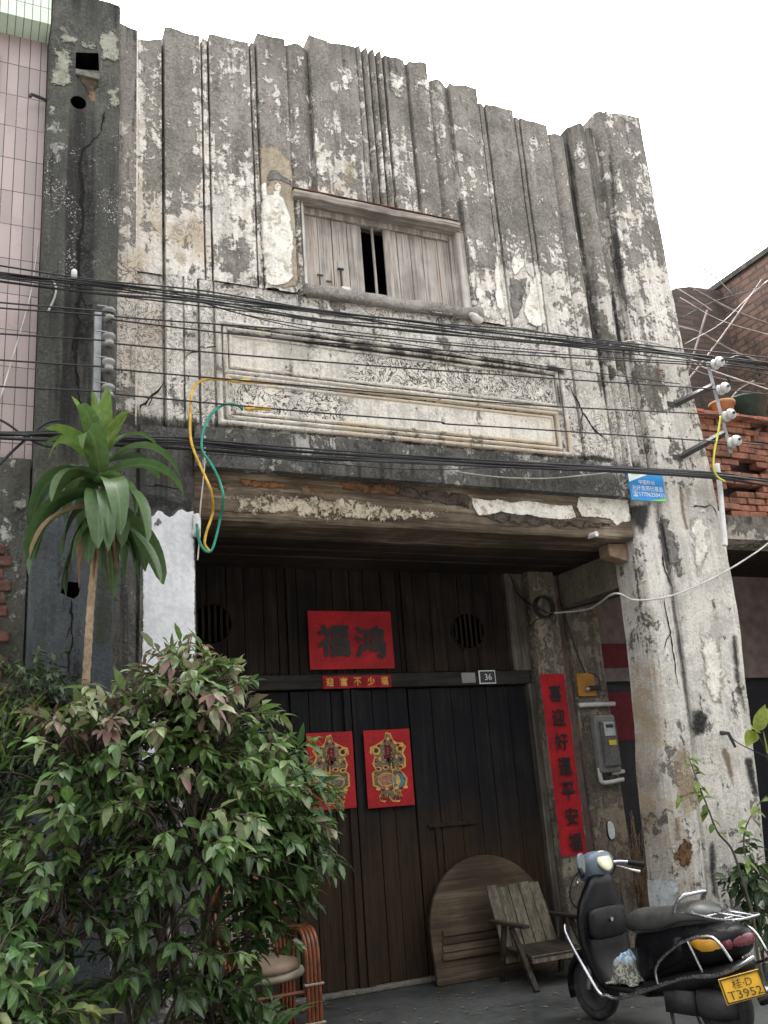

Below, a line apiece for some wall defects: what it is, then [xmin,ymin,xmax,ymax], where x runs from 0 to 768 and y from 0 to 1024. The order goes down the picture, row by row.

spalling [51,26,121,108]
crack [71,112,105,404]
flaking render [212,145,302,288]
peeling [475,256,546,327]
water stain [585,283,606,404]
water stain [609,155,637,435]
crack [569,386,608,441]
spalling [212,478,631,529]
crack [66,600,74,680]
crack [662,553,678,685]